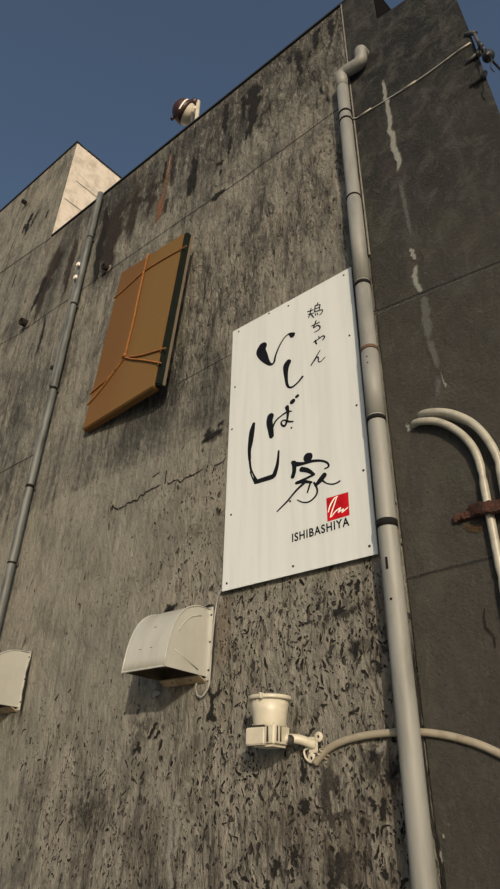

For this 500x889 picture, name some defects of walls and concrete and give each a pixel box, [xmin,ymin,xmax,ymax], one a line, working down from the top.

water stain [382,81,402,171]
water stain [31,240,78,352]
water stain [409,248,447,396]
crack [111,459,225,511]